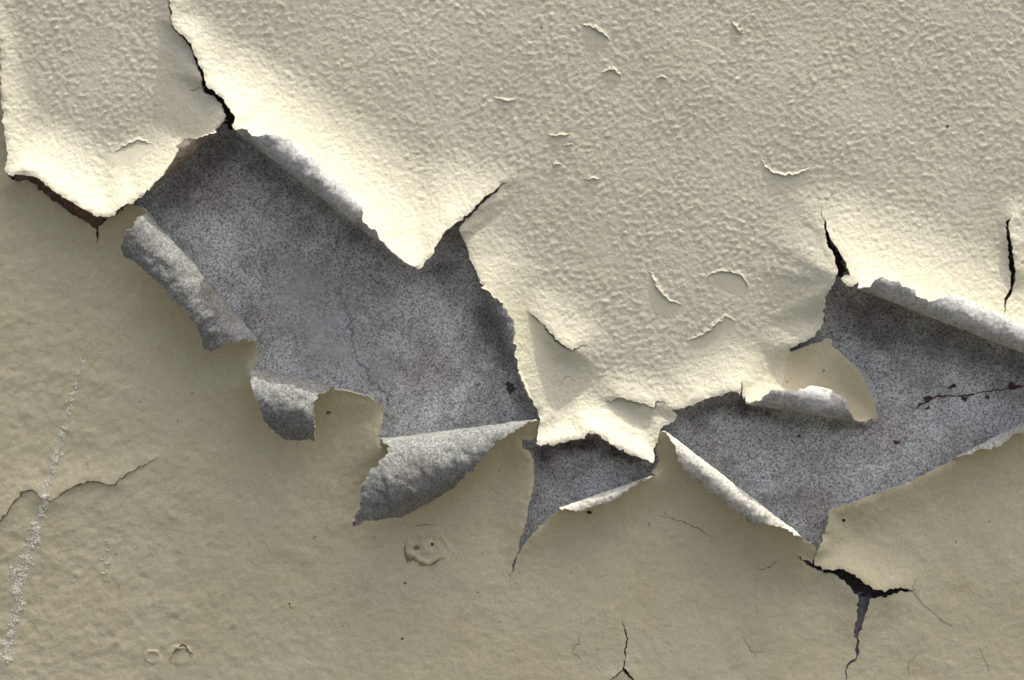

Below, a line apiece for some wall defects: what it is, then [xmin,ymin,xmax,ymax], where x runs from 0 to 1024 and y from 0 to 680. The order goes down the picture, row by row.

peeling [106,136,153,165]
peeling [760,159,811,188]
crack [822,218,846,277]
crack [1004,220,1015,306]
peeling [648,270,682,316]
peeling [121,120,659,571]
peeling [661,267,1024,558]
crack [759,556,952,677]
crack [611,621,634,680]